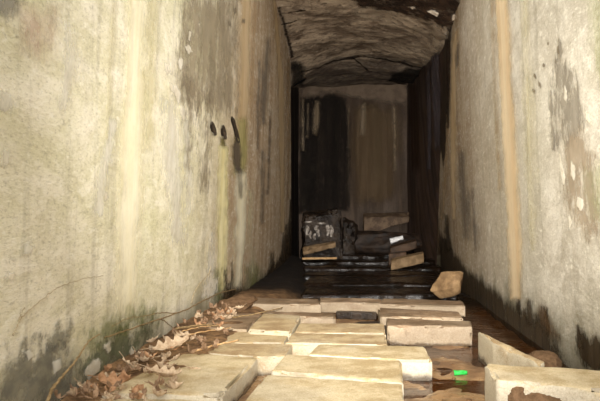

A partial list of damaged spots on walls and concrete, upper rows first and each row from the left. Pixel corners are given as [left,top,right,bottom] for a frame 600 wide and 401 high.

damp [161,0,238,243]
peeling [549,40,599,234]
damp [0,322,79,401]
damp [437,216,564,365]
damp [577,325,600,371]